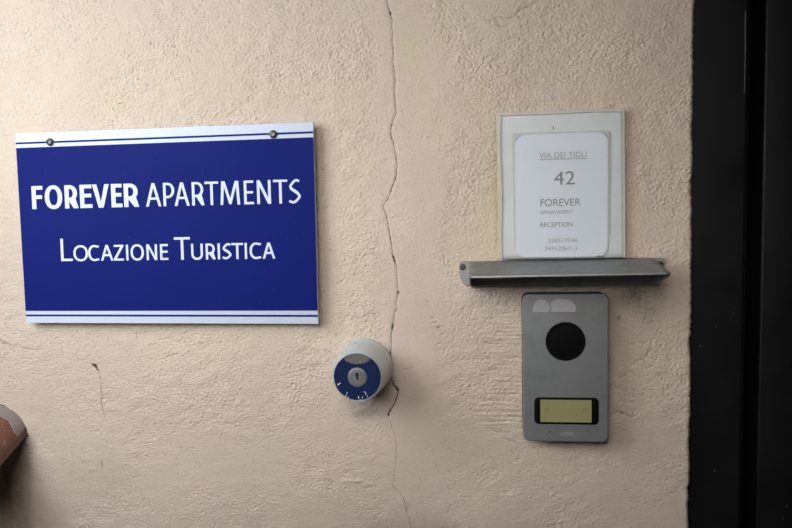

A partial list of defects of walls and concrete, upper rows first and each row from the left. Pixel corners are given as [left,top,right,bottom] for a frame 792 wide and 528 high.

crack [382,0,399,354]
crack [388,377,399,426]